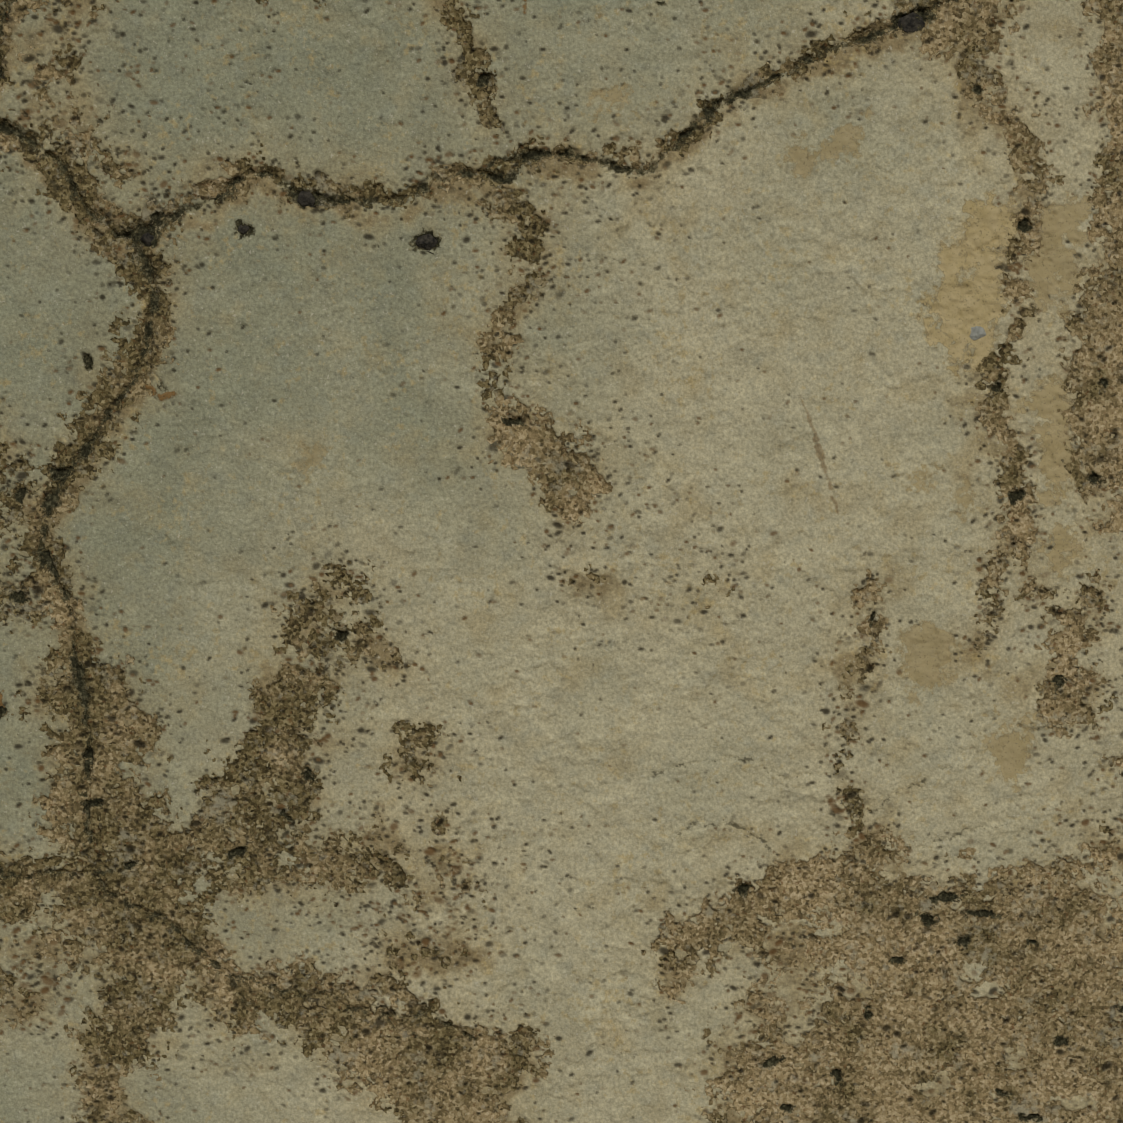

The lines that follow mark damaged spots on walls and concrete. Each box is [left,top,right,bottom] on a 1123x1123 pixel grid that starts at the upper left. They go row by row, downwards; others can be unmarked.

spalling [439,0,504,137]
crack [0,0,975,847]
spalling [475,182,613,526]
spalling [702,570,735,609]
spalling [838,569,892,701]
spalling [917,0,1123,792]
crack [0,865,476,1040]
spalling [0,559,556,1123]
spalling [641,717,1123,1123]